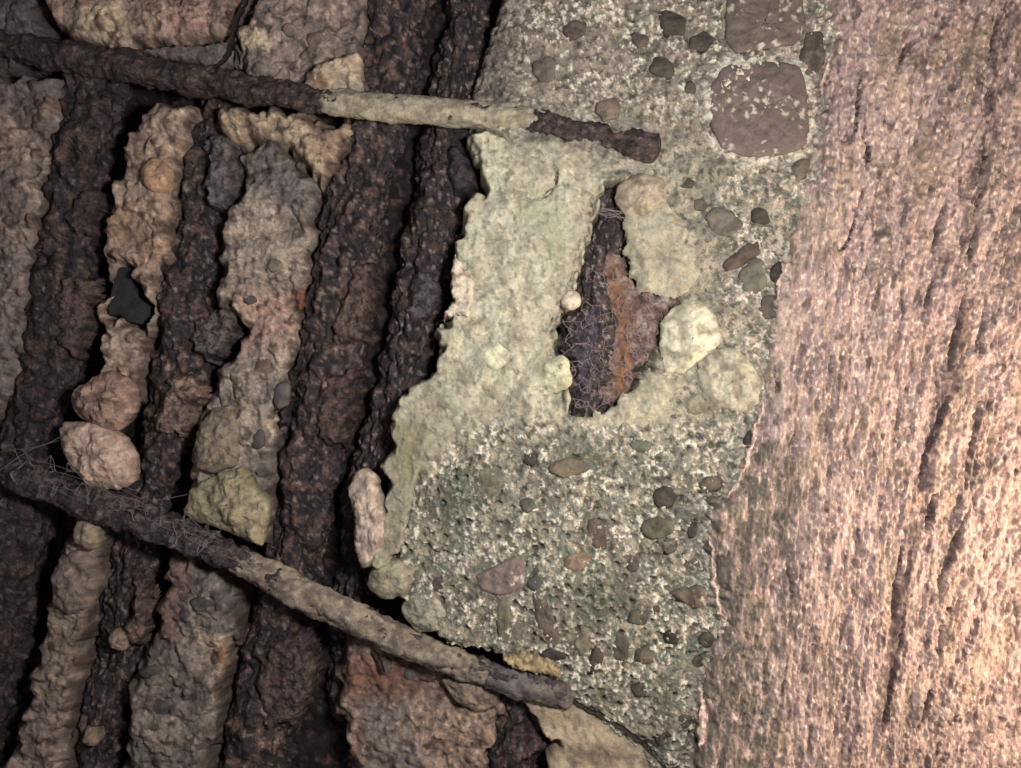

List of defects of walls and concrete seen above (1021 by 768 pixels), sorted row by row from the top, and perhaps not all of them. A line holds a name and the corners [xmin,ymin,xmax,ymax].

spalling [0,0,437,95]
spalling [326,0,840,768]